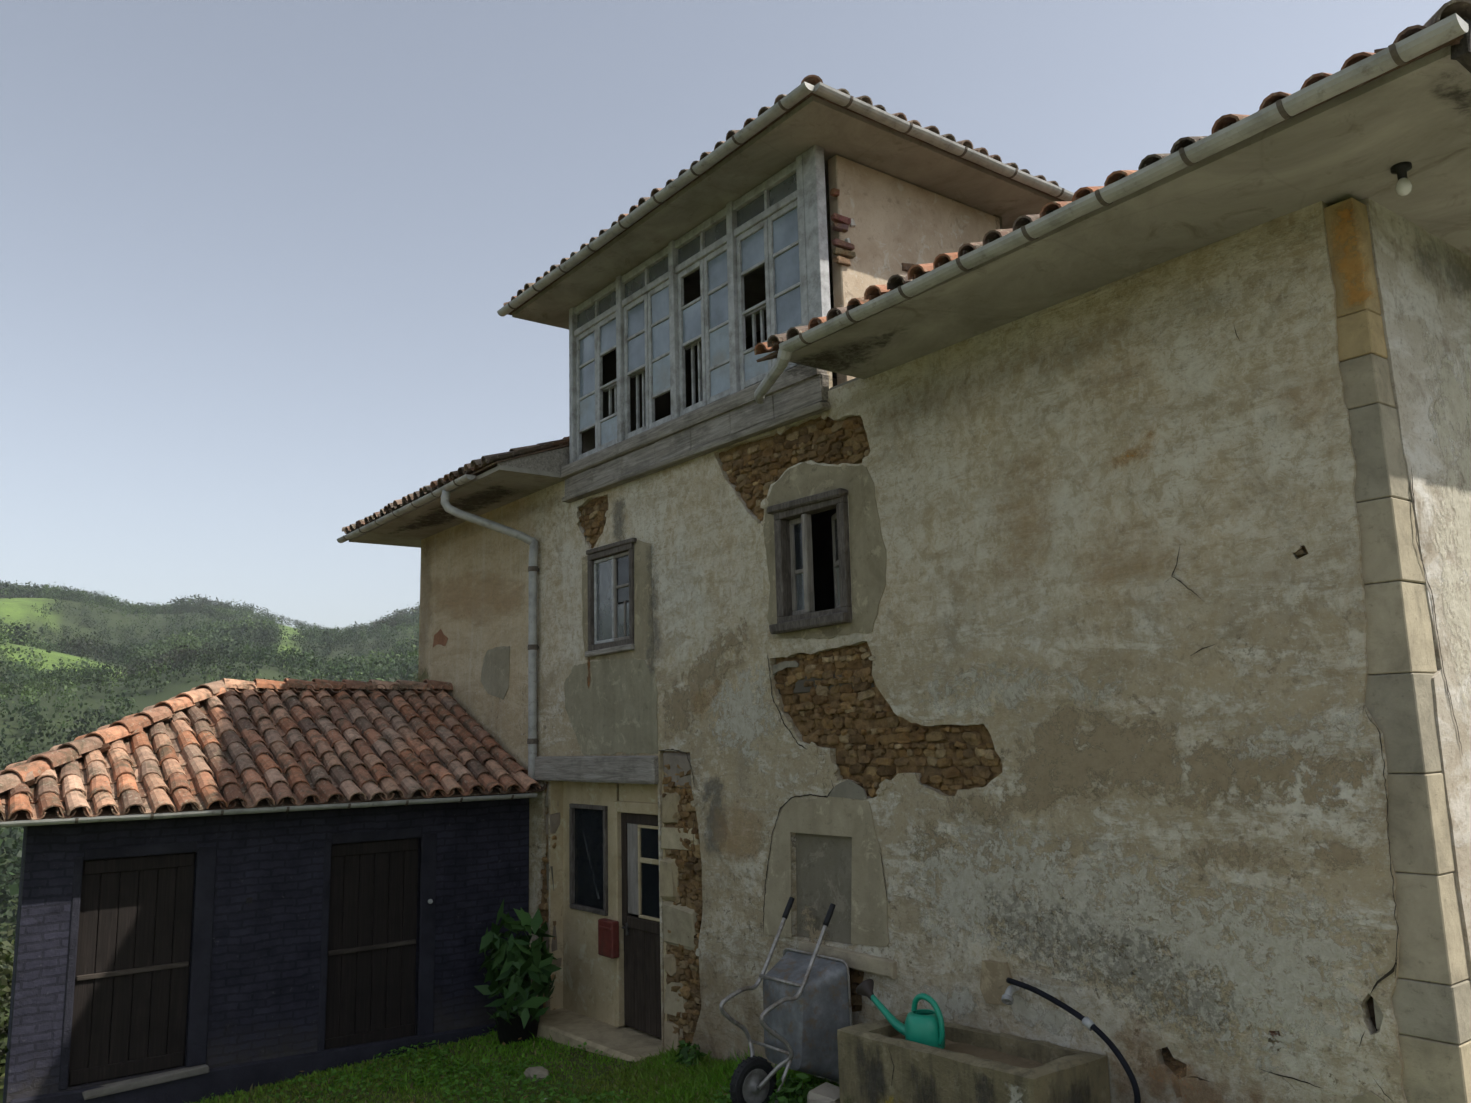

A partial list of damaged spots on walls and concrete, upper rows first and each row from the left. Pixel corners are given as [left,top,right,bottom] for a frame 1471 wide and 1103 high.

spalling [830,188,856,266]
spalling [575,496,611,548]
spalling [719,411,872,525]
spalling [774,642,1377,861]
spalling [662,622,748,1052]
crack [1364,707,1399,995]
spalling [1367,996,1378,1031]